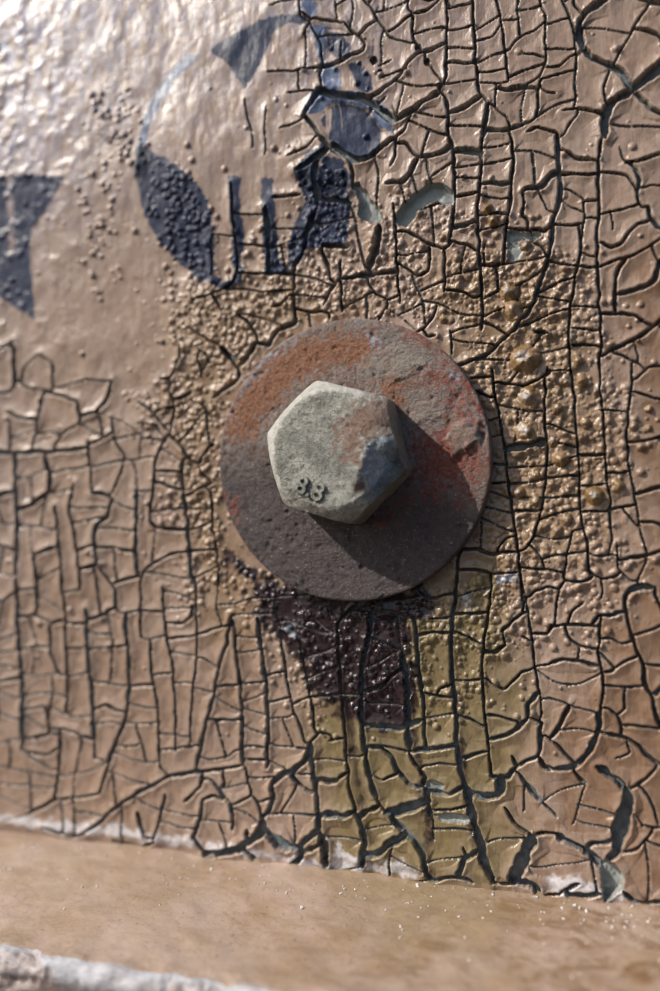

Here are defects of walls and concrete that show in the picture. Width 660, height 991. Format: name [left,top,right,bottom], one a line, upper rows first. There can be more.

peeling [353,183,384,223]
peeling [395,183,455,227]
crack [190,183,337,379]
crack [0,342,151,609]
crack [86,404,215,520]
crack [139,392,193,429]
crack [160,347,181,389]
crack [214,0,660,899]
crack [0,467,347,865]
crack [623,890,639,904]